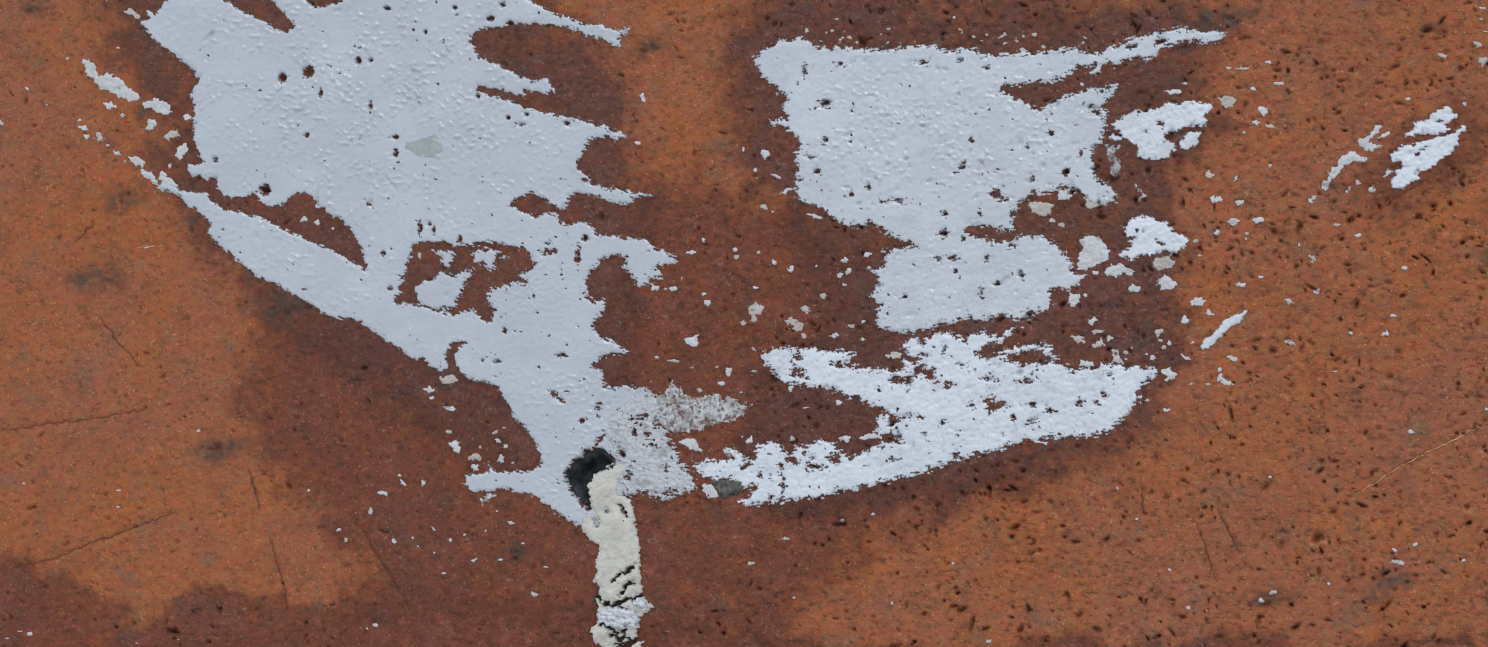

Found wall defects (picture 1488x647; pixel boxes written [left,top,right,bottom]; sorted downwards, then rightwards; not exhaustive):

leakage [104,0,373,281]
leakage [0,268,602,647]
leakage [387,220,558,334]
peeling [78,0,1247,527]
leakage [469,0,1237,647]
peeling [1226,60,1275,134]
peeling [1311,102,1467,200]
leakage [1360,121,1475,206]